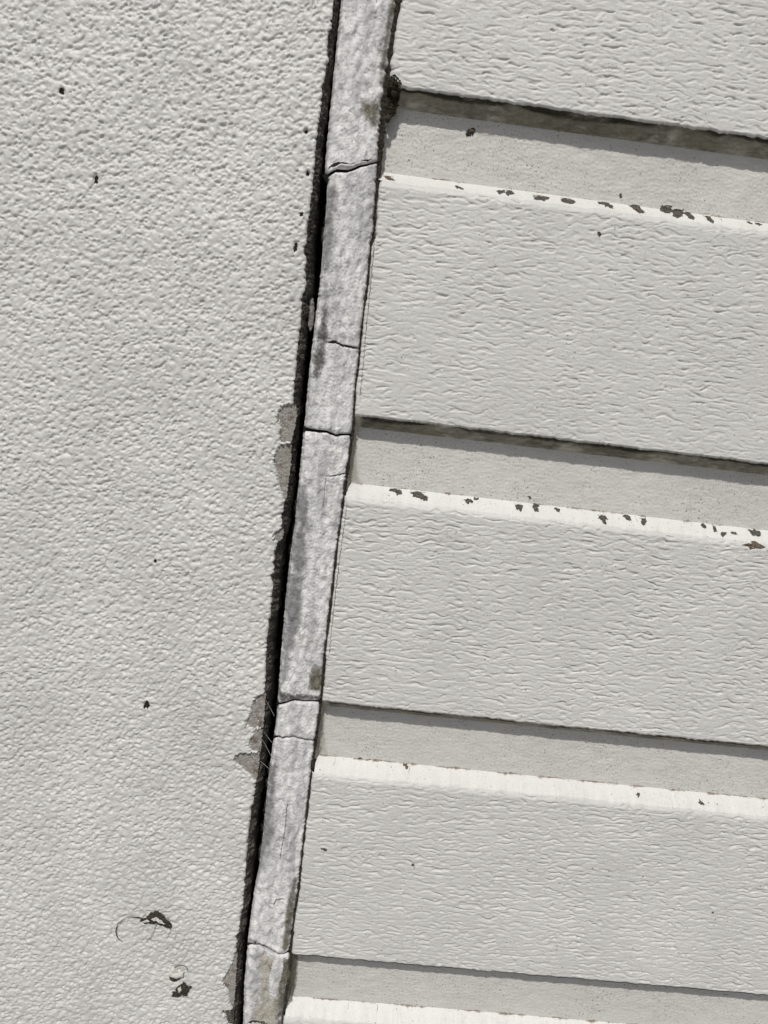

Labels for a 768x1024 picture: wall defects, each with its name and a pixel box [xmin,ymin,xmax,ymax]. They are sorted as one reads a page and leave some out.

peeling [533,194,575,204]
peeling [598,193,645,213]
peeling [660,202,714,223]
spalling [221,0,341,1024]
crack [246,0,402,1024]
peeling [389,487,428,501]
peeling [514,496,539,512]
peeling [701,523,765,550]